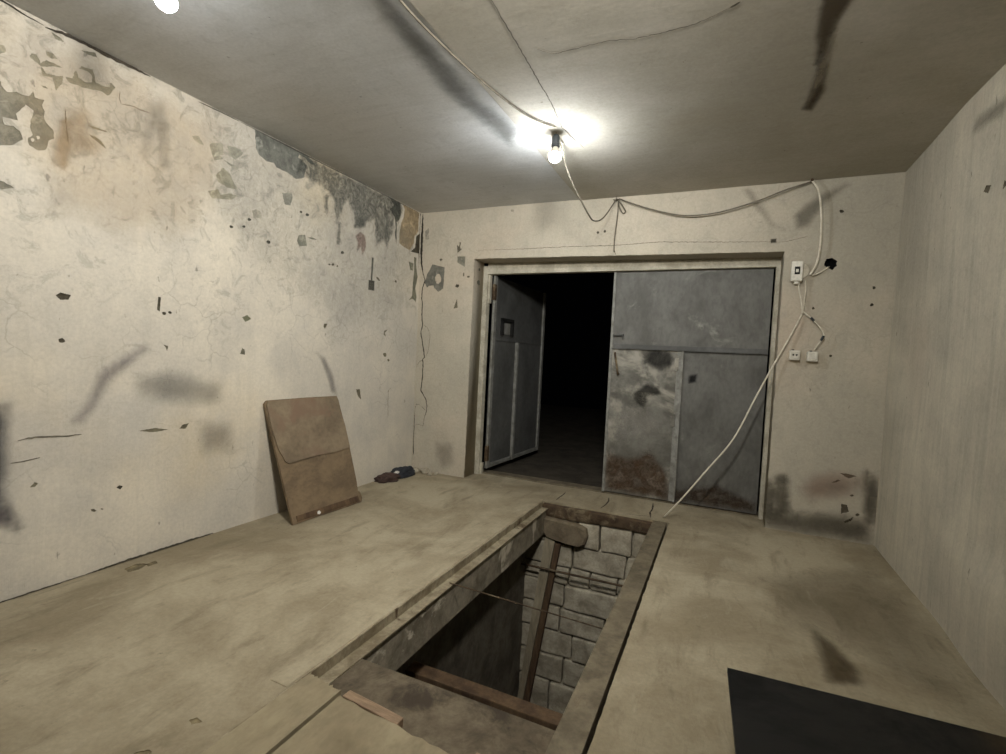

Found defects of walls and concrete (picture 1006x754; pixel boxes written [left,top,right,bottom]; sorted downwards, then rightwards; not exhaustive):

peeling [0,51,115,151]
water stain [804,0,850,110]
water stain [765,478,877,536]